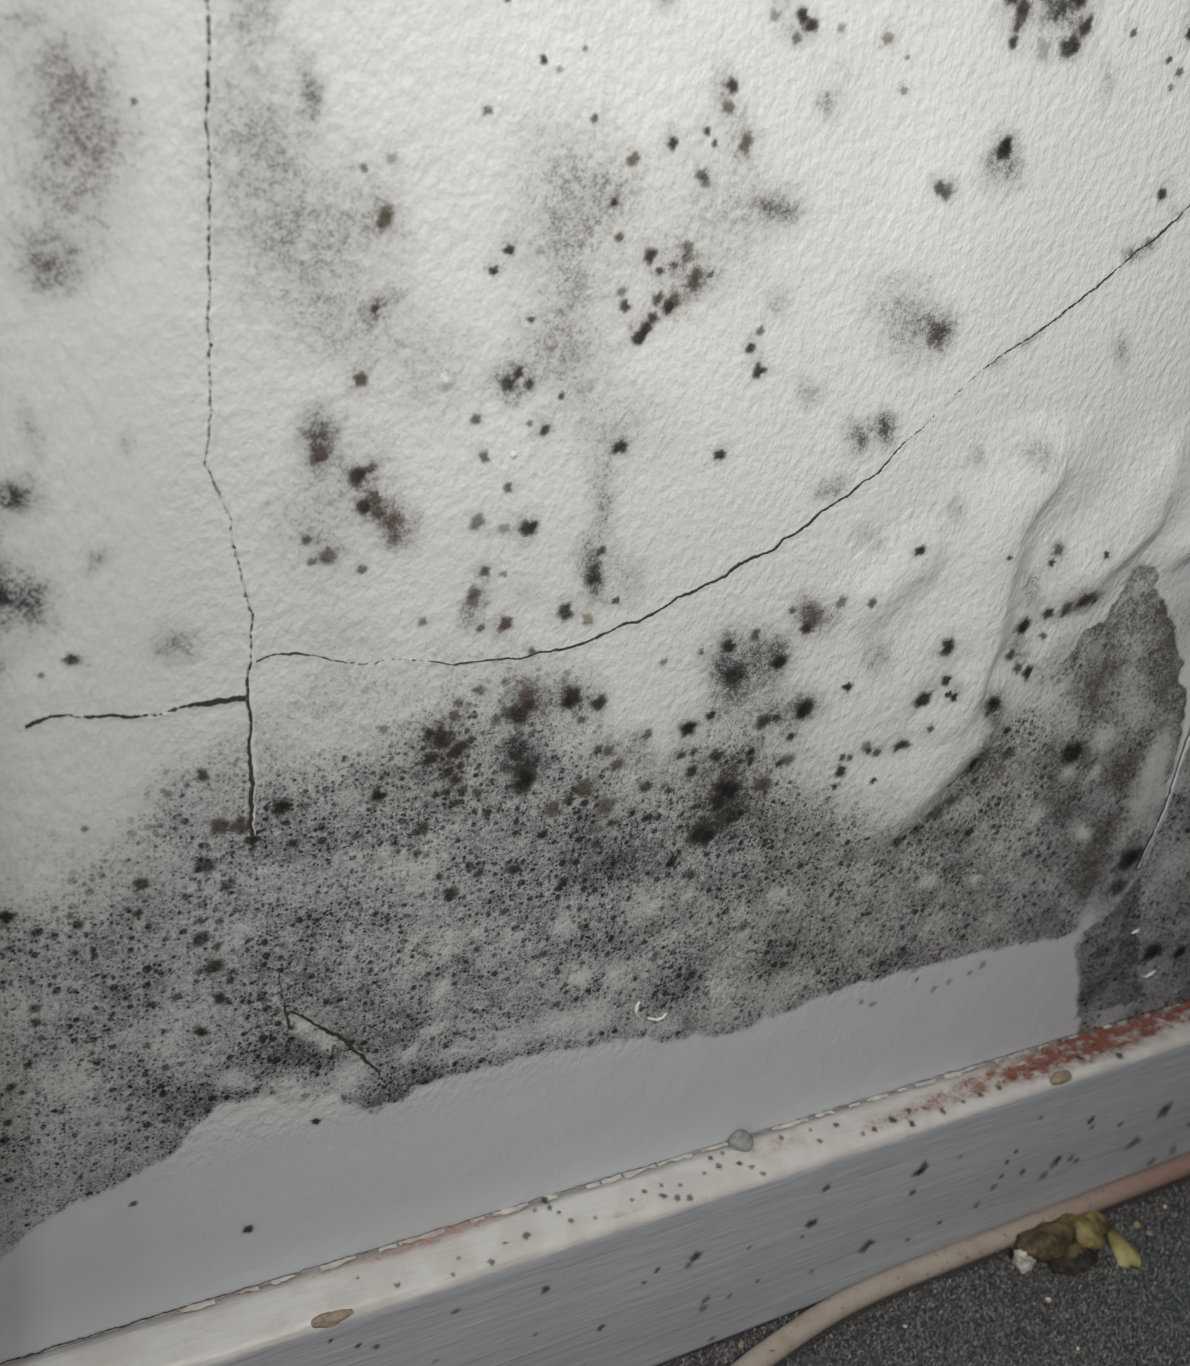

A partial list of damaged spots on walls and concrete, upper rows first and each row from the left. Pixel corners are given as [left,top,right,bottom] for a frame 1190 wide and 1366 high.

water stain [794,8,819,43]
water stain [1008,0,1093,57]
water stain [990,135,1014,177]
water stain [633,243,713,344]
water stain [746,327,767,378]
water stain [350,464,410,546]
crack [25,0,1190,1091]
water stain [1007,592,1099,679]
water stain [0,630,1190,1249]
peeling [634,1001,668,1021]
corrosion [875,1000,1190,1124]
peeling [311,1309,353,1328]